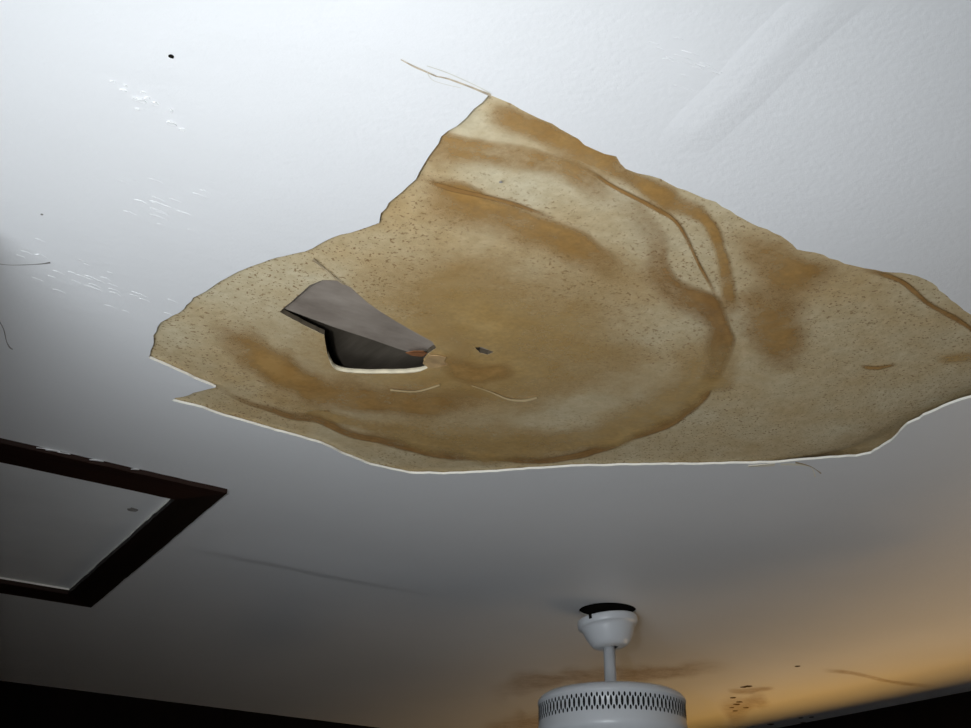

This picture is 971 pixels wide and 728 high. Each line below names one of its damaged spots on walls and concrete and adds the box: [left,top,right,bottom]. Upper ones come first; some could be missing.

crack [401,59,491,97]
water stain [233,110,734,464]
peeling [150,96,971,472]
water stain [878,272,971,331]